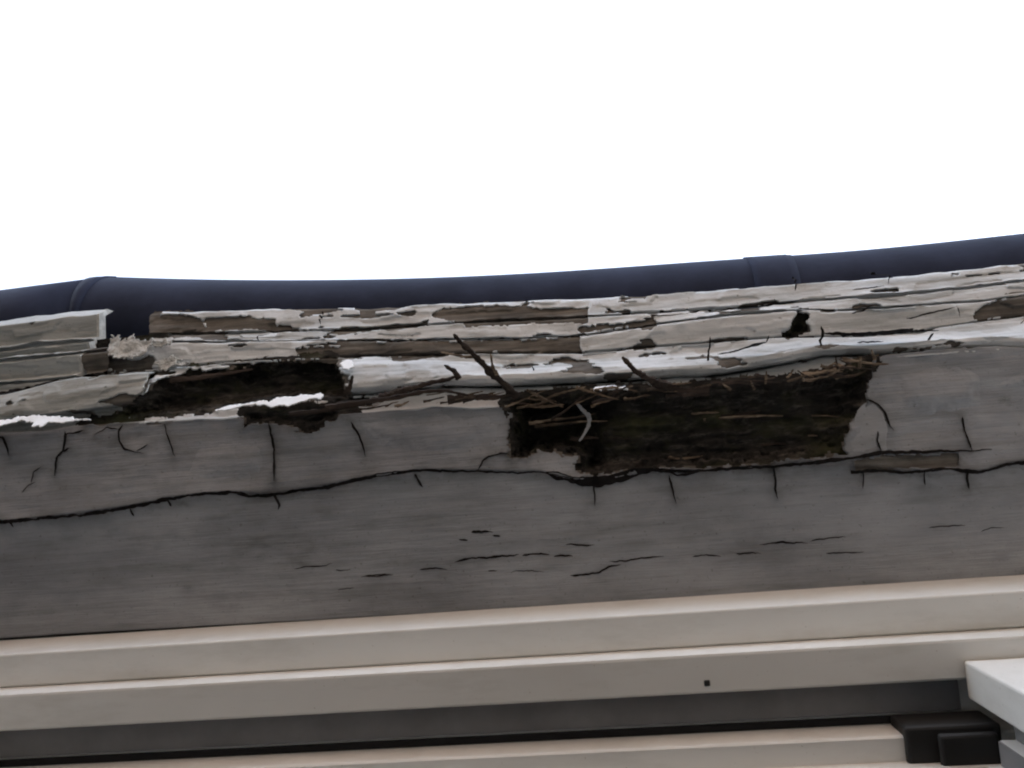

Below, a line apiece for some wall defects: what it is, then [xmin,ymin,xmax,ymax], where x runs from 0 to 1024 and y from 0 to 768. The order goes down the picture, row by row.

peeling [968,292,1024,324]
peeling [81,347,156,375]
peeling [148,310,282,343]
peeling [293,301,657,371]
peeling [887,341,961,355]
peeling [0,415,91,428]
peeling [577,404,592,441]
peeling [850,403,888,452]
crack [0,399,1024,527]
crack [930,524,1002,532]